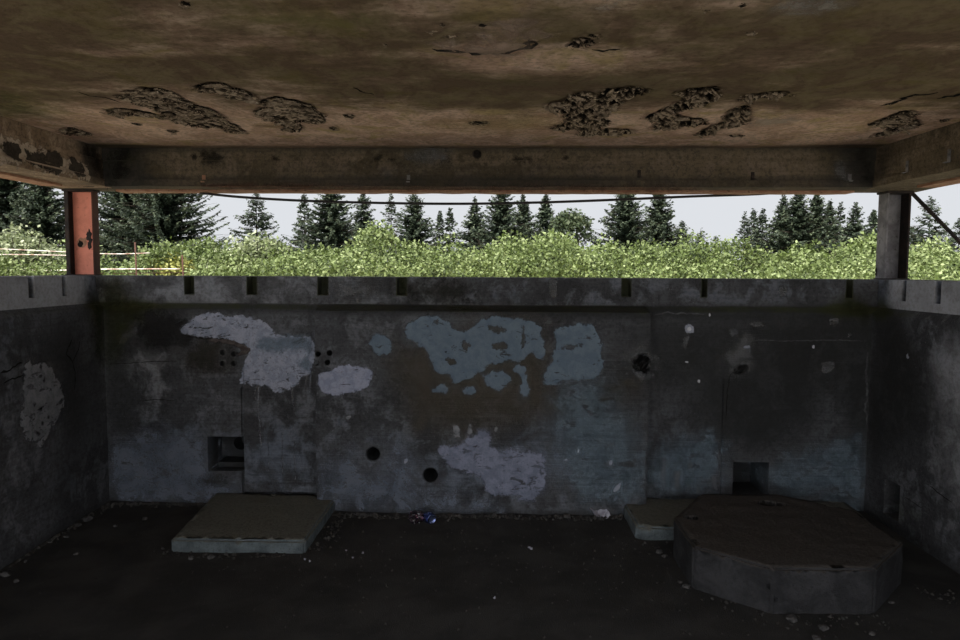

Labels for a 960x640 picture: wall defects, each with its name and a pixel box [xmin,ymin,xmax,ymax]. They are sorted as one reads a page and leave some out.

spalling [102,82,339,134]
spalling [542,86,651,138]
spalling [640,86,796,138]
spalling [868,110,924,138]
peeling [0,134,91,182]
rust [77,229,93,250]
peeling [180,312,373,396]
peeling [404,314,605,397]
peeling [19,359,65,448]
peeling [438,423,547,501]